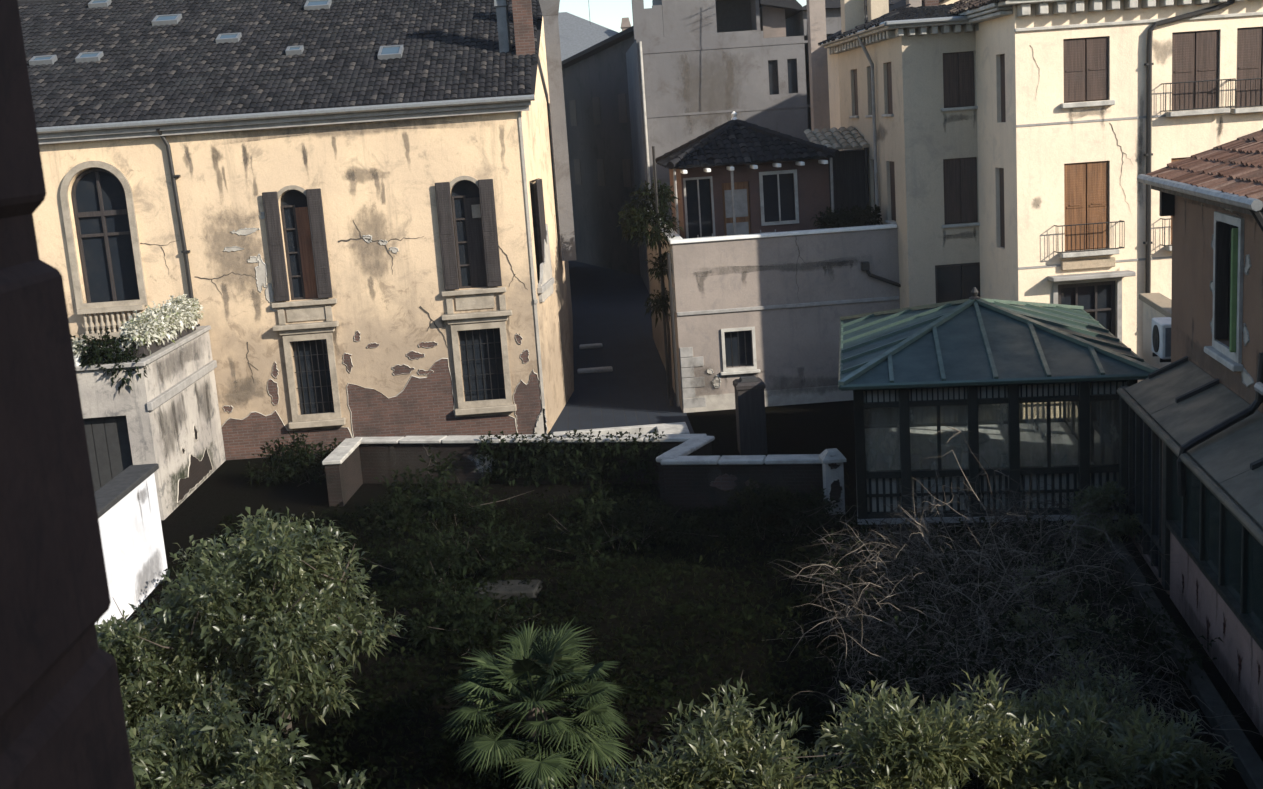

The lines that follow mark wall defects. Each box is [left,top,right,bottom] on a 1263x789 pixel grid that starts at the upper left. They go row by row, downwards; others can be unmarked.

crack [1110,123,1130,208]
crack [140,240,255,295]
crack [338,220,424,275]
crack [419,306,448,348]
flaking render [177,331,548,503]
water stain [171,443,213,506]